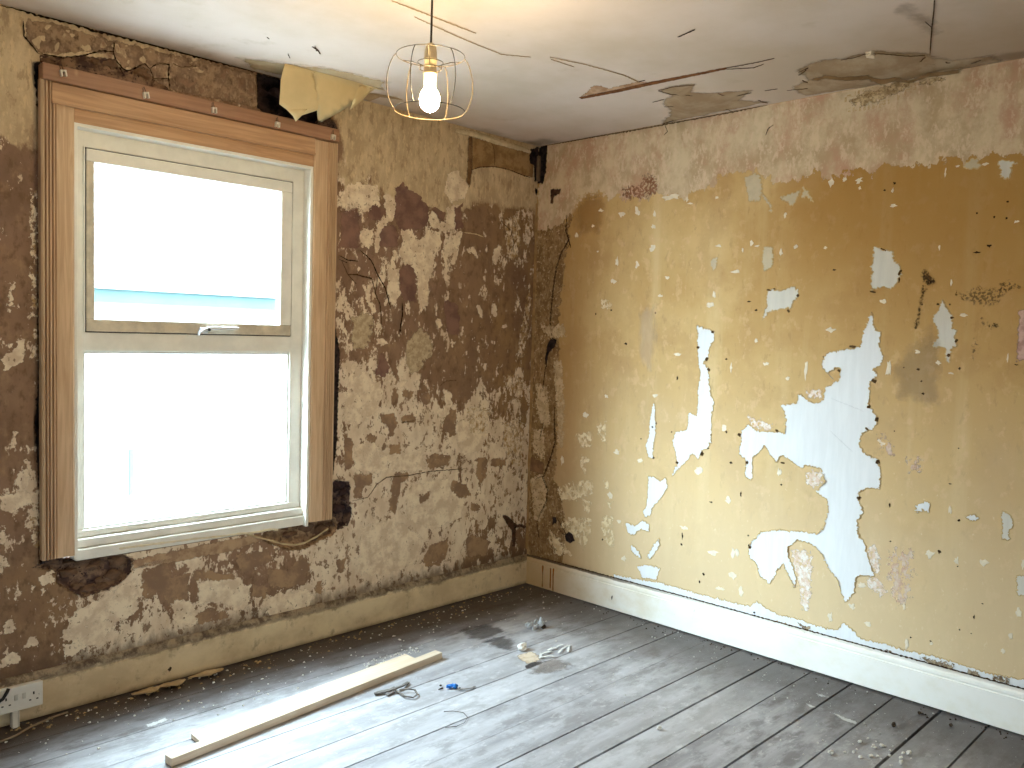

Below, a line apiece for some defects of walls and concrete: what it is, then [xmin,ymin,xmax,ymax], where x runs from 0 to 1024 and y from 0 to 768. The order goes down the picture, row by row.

crack [0,5,255,87]
spalling [256,73,337,129]
peeling [1,186,38,371]
peeling [339,170,478,328]
peeling [492,217,521,265]
crack [550,217,571,336]
peeling [0,459,39,548]
peeling [14,441,466,657]
peeling [437,389,492,455]
peeling [503,287,551,467]
crack [537,367,566,537]
peeling [0,636,39,668]